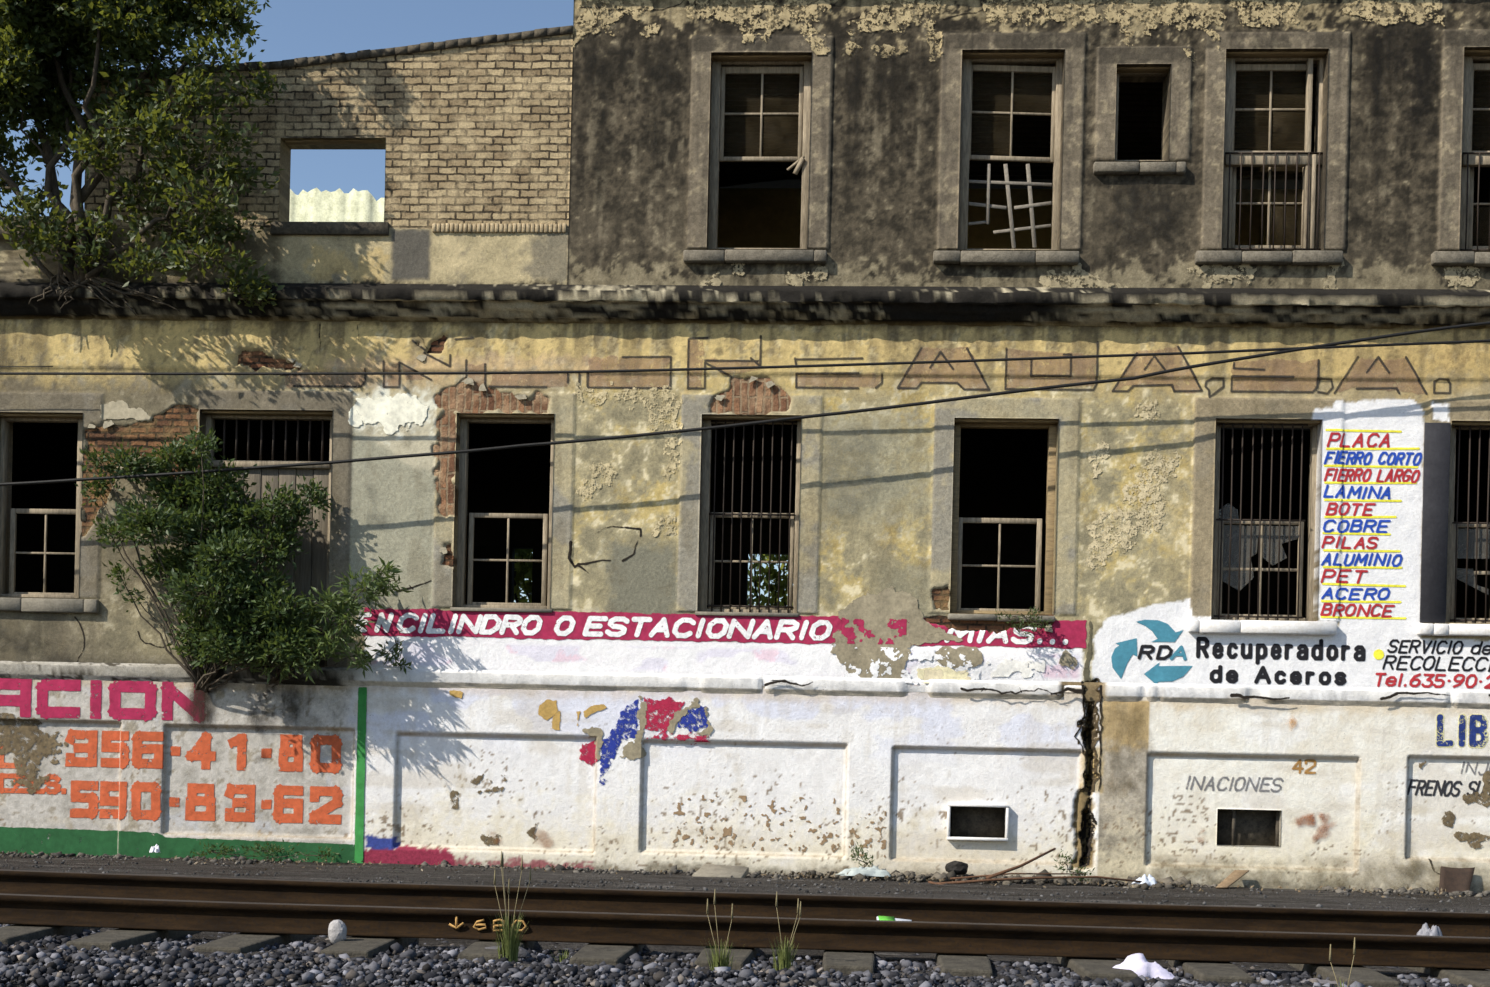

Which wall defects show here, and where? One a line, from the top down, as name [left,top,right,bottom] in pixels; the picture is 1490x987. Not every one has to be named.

flaking render [710,376,791,415]
flaking render [82,400,201,536]
flaking render [348,377,550,517]
peeling [831,586,1054,683]
peeling [1059,650,1078,670]
peeling [0,713,68,794]
peeling [538,695,714,785]
crack [960,621,1103,868]
peeling [1441,770,1490,849]